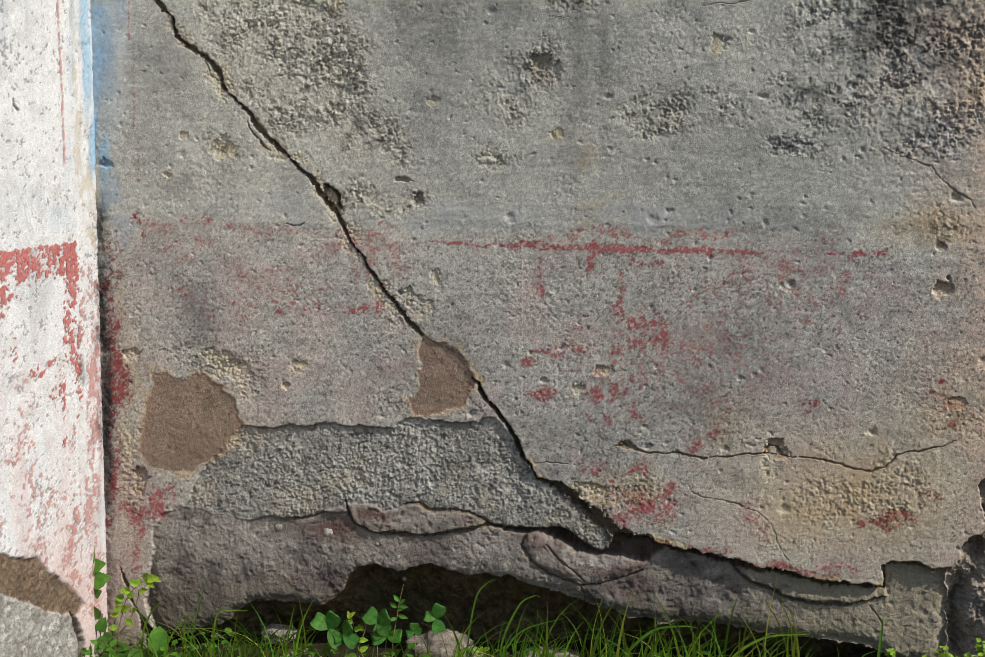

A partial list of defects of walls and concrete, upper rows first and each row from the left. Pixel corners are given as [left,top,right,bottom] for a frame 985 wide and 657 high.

water stain [860,0,938,50]
crack [156,0,424,336]
peeling [129,187,410,277]
peeling [428,224,888,466]
crack [243,422,397,430]
spalling [0,231,680,617]
spalling [924,379,980,431]
crack [294,379,957,623]
peeling [688,545,857,580]
peeling [856,509,917,532]